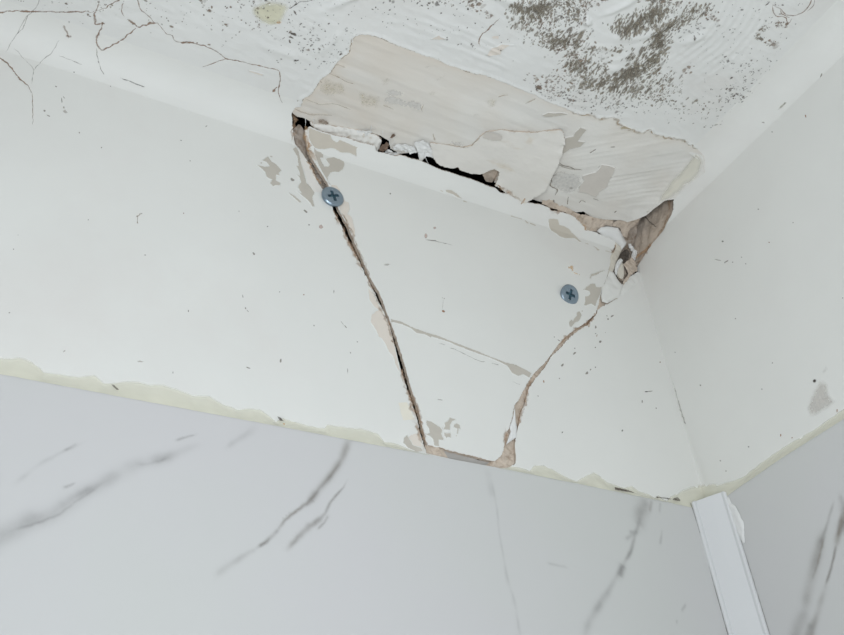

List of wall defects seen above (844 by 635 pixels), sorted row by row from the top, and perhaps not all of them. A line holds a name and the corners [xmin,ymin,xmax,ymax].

crack [0,58,33,124]
crack [0,0,282,102]
damp [224,0,312,30]
damp [504,0,719,128]
peeling [257,156,282,187]
crack [293,124,327,189]
peeling [288,30,705,348]
peeling [390,318,532,453]
crack [401,321,590,468]